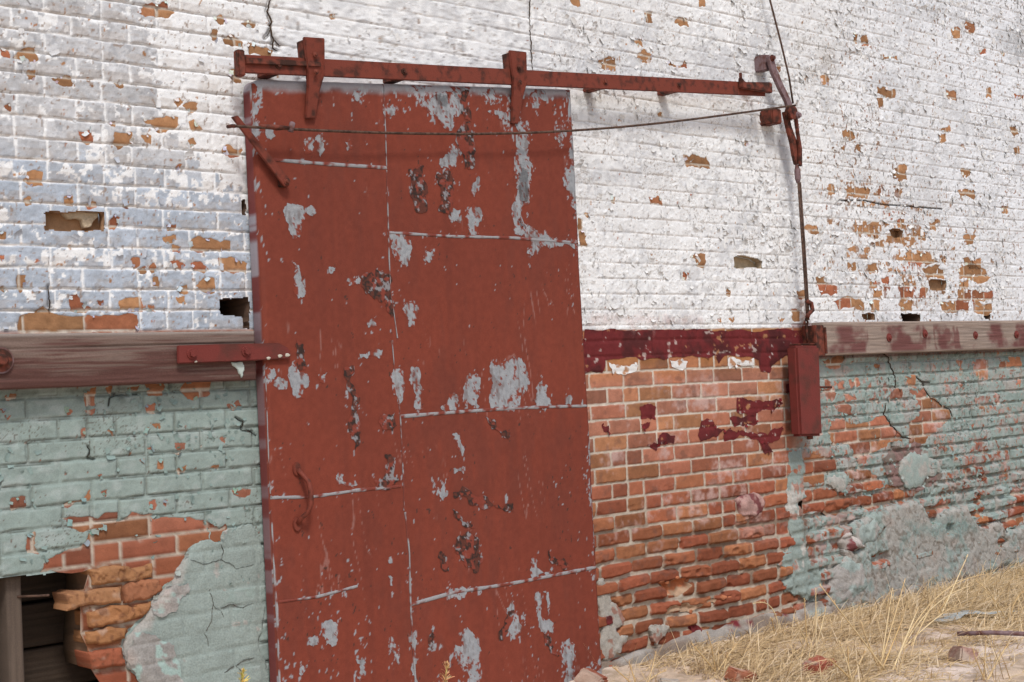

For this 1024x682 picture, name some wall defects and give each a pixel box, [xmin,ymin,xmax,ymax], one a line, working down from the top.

crack [264,0,280,51]
peeling [109,98,203,170]
corrosion [408,165,454,216]
peeling [411,0,1024,375]
spalling [44,189,250,329]
peeling [3,294,155,334]
peeling [441,356,552,412]
crack [883,354,953,439]
spalling [698,351,1024,609]
spalling [19,474,270,682]
peeling [455,627,481,682]
spalling [534,578,628,682]